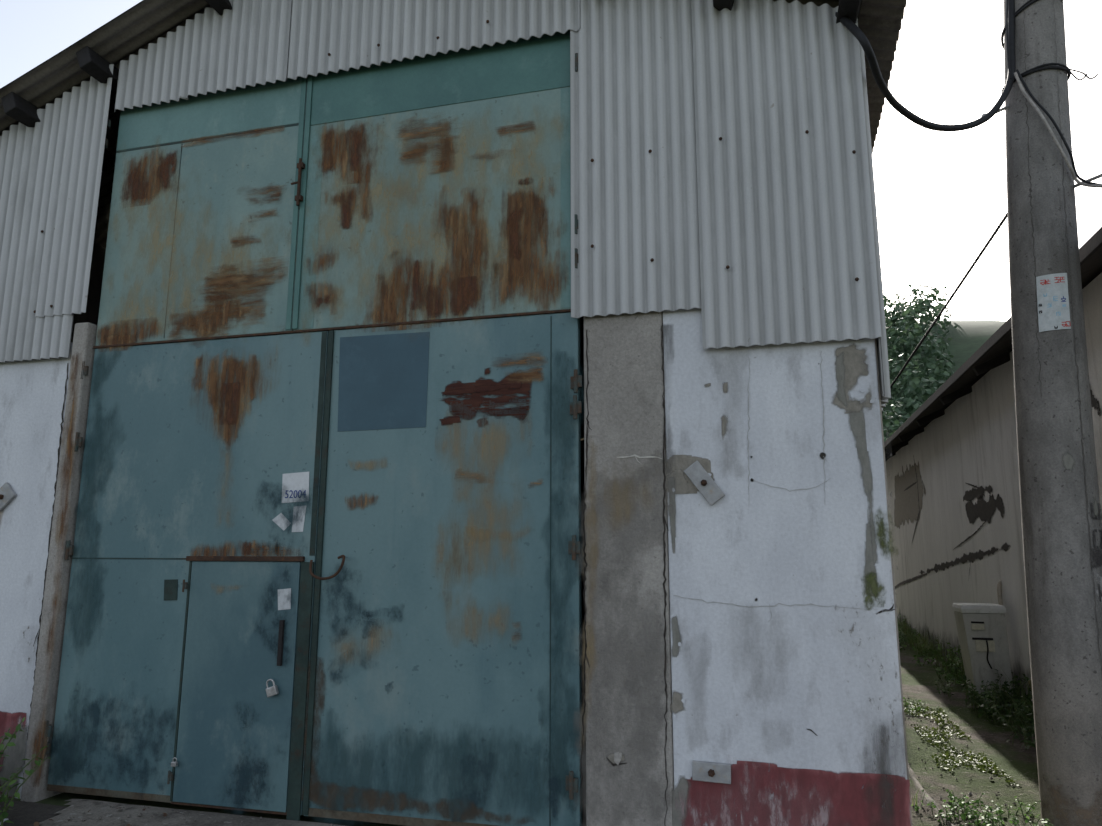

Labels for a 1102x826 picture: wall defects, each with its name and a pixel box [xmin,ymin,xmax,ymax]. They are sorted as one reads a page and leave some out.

rust [123,153,176,204]
rust [321,124,370,229]
rust [400,123,453,173]
rust [498,123,534,134]
rust [98,257,283,350]
rust [372,178,566,330]
rust [194,356,262,445]
peeling [833,344,877,596]
crack [580,330,590,812]
crack [617,323,898,825]